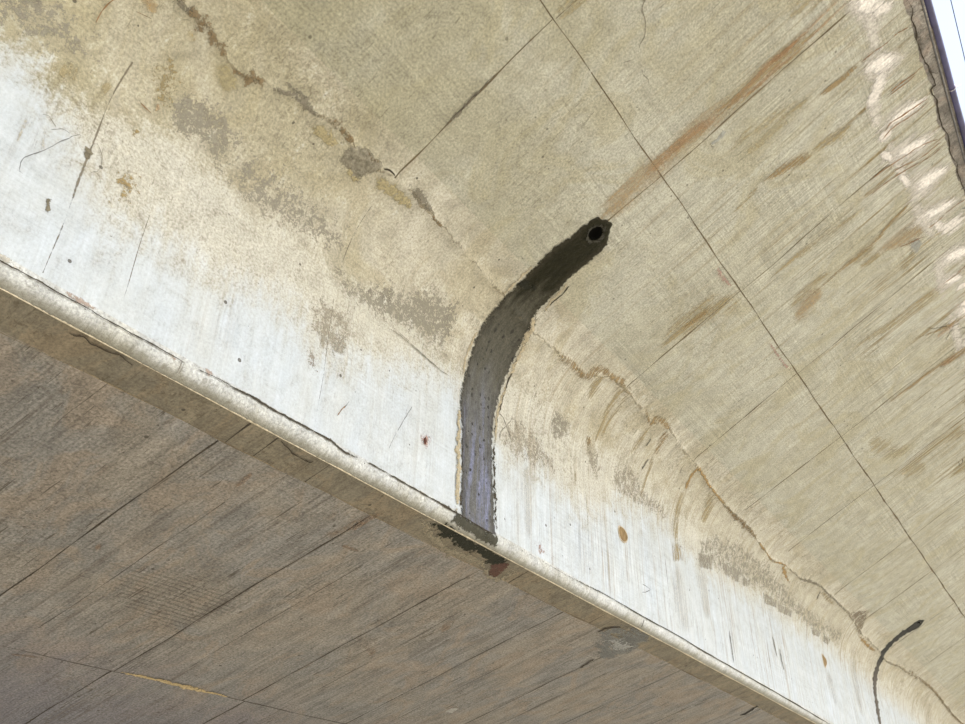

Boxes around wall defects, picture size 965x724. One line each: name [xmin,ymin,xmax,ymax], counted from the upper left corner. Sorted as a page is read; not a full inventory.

rust [820,27,908,95]
rust [603,0,852,216]
leakage [846,0,965,237]
rust [872,139,944,194]
rust [661,294,738,346]
rust [792,200,964,317]
rust [856,266,965,346]
leakage [933,242,965,297]
leakage [948,301,965,352]
crack [0,260,493,534]
crack [543,561,829,724]